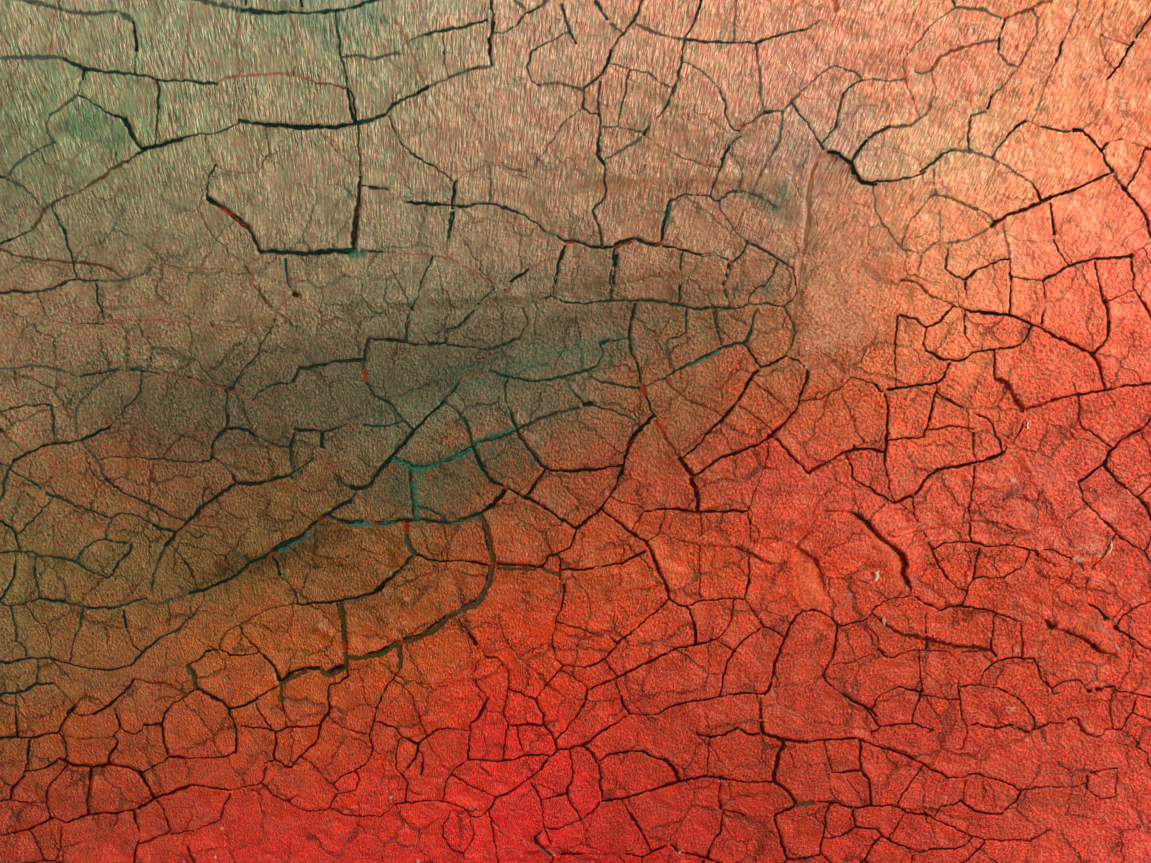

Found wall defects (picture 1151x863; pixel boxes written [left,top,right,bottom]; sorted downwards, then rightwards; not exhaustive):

crack [0,127,152,325]
crack [0,0,548,258]
crack [827,0,1151,272]
crack [0,256,657,863]
crack [388,0,1118,863]
crack [775,223,1151,570]
crack [1067,685,1151,767]
crack [1113,601,1151,651]